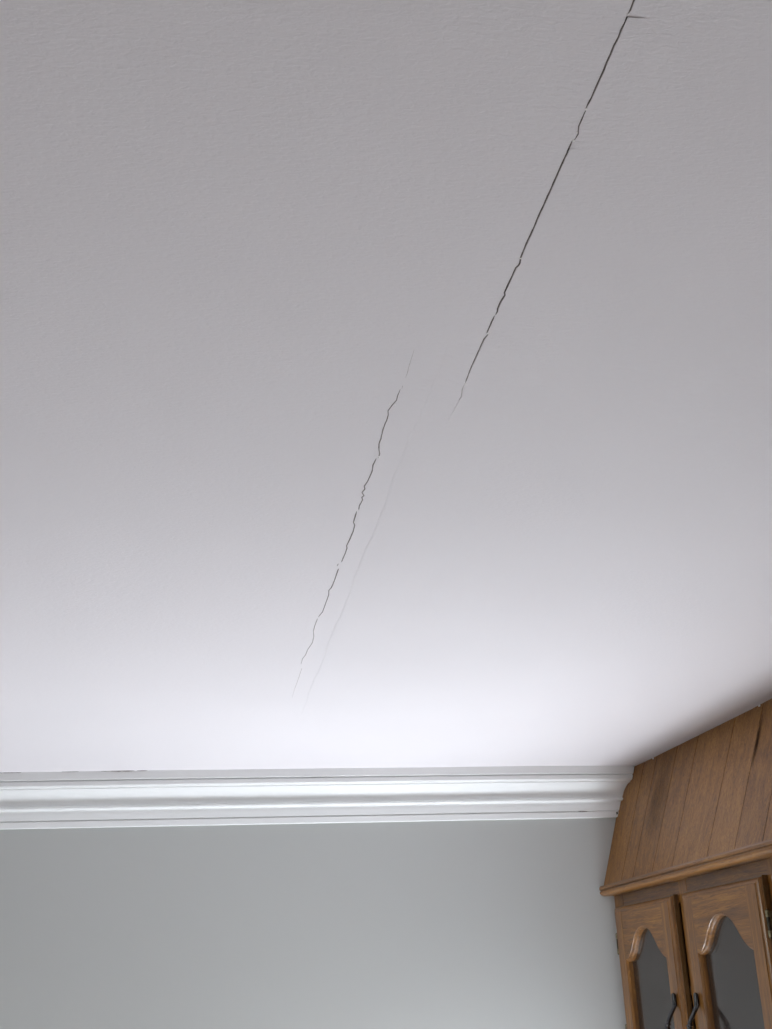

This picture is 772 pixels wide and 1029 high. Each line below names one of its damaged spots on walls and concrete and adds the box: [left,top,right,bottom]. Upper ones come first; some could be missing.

crack [448,0,661,422]
crack [293,351,414,693]